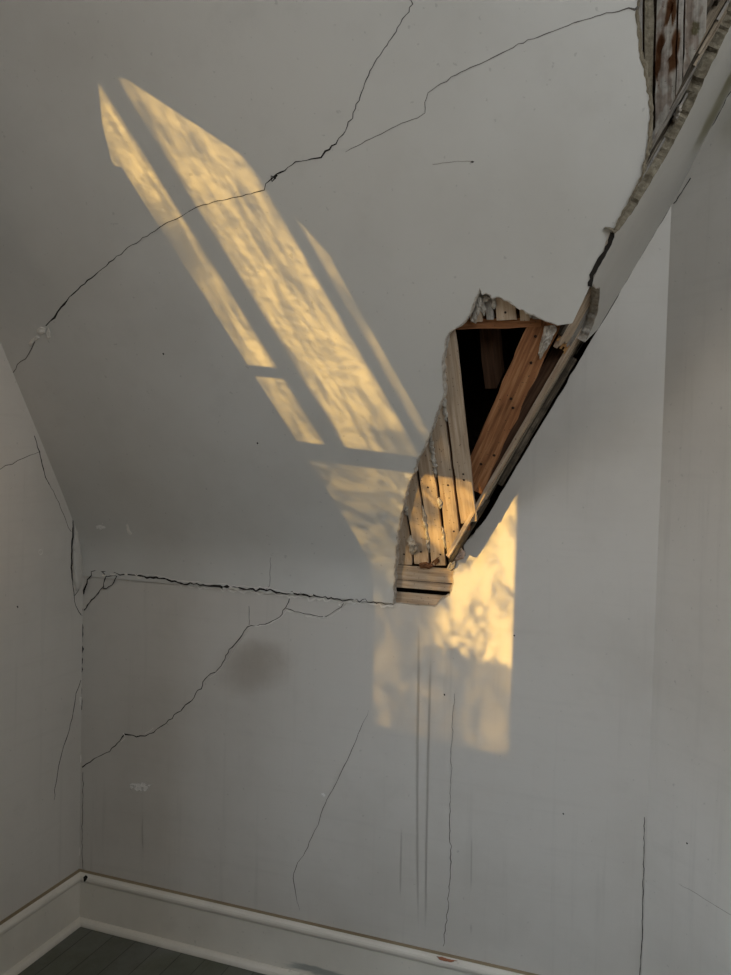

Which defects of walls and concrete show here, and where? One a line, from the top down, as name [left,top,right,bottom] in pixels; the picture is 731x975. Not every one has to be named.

crack [13,1,639,373]
flaking render [604,0,731,234]
flaking render [393,284,600,607]
crack [1,436,394,865]
crack [293,714,368,910]